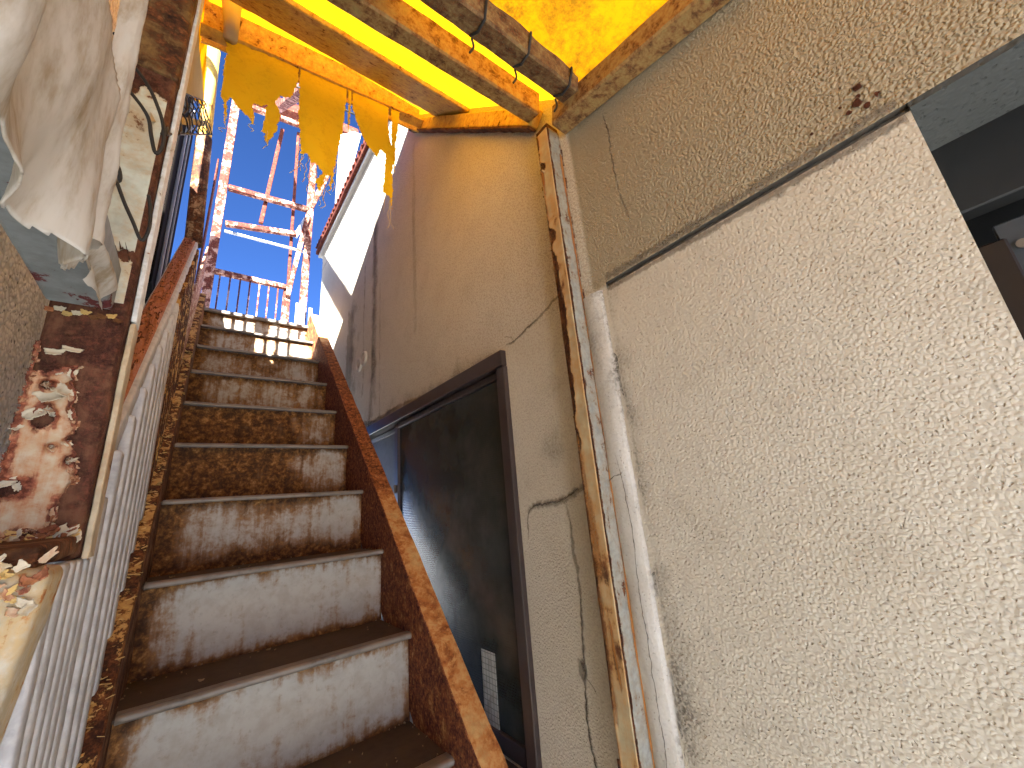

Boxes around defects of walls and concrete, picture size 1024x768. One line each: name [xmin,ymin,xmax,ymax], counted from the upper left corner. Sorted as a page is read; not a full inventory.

rust [560,154,594,371]
peeling [0,340,84,618]
crack [533,492,574,507]
rust [596,388,656,768]
crack [581,617,597,768]